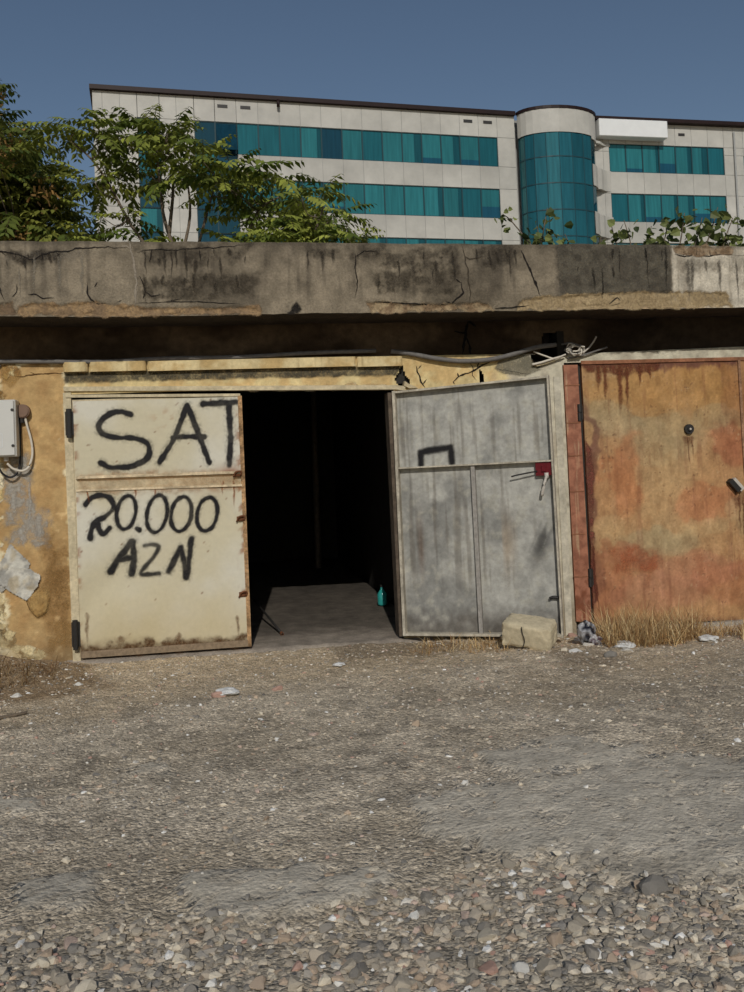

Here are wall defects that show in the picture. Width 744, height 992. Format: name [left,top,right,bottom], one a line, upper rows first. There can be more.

crack [0,239,246,305]
leakage [143,246,250,298]
crack [495,251,540,309]
leakage [687,261,721,287]
crack [354,246,523,383]
corrosion [584,363,659,402]
corrosion [585,441,598,605]
spalling [0,594,46,660]